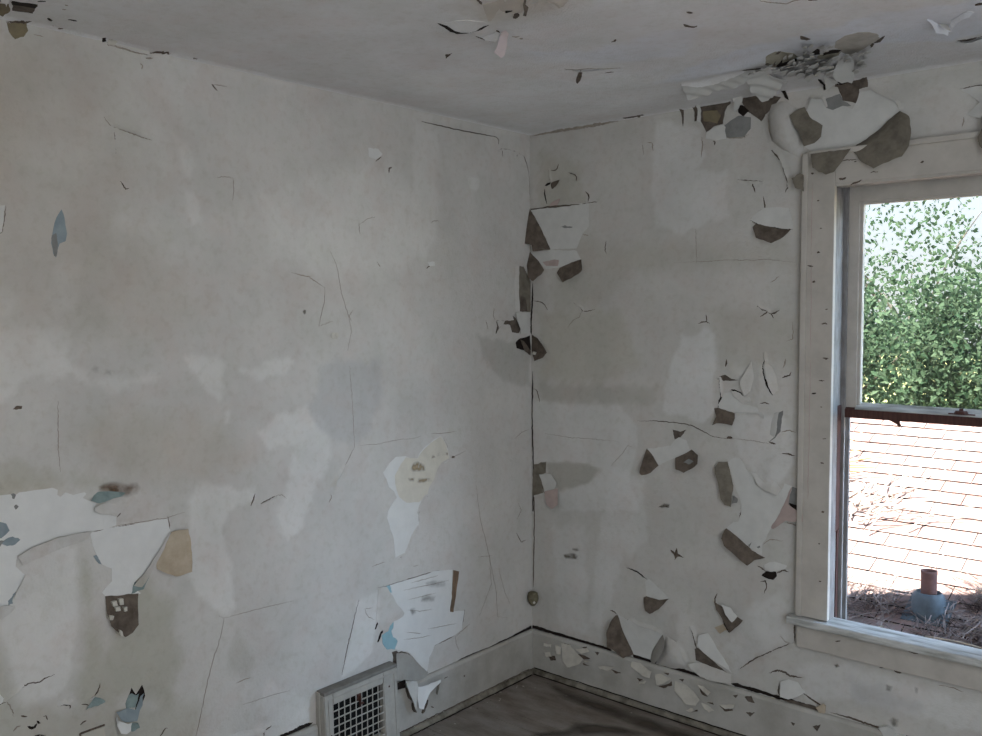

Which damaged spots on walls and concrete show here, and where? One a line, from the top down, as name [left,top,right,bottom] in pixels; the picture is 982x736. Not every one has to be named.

peeling [679,32,911,191]
crack [295,253,353,348]
peeling [486,311,547,361]
peeling [525,202,593,282]
peeling [639,430,698,475]
peeling [712,351,796,444]
peeling [0,488,193,637]
peeling [715,457,803,593]
peeling [115,686,145,734]
crack [196,601,291,735]
peeling [375,570,467,713]
peeling [544,567,754,717]